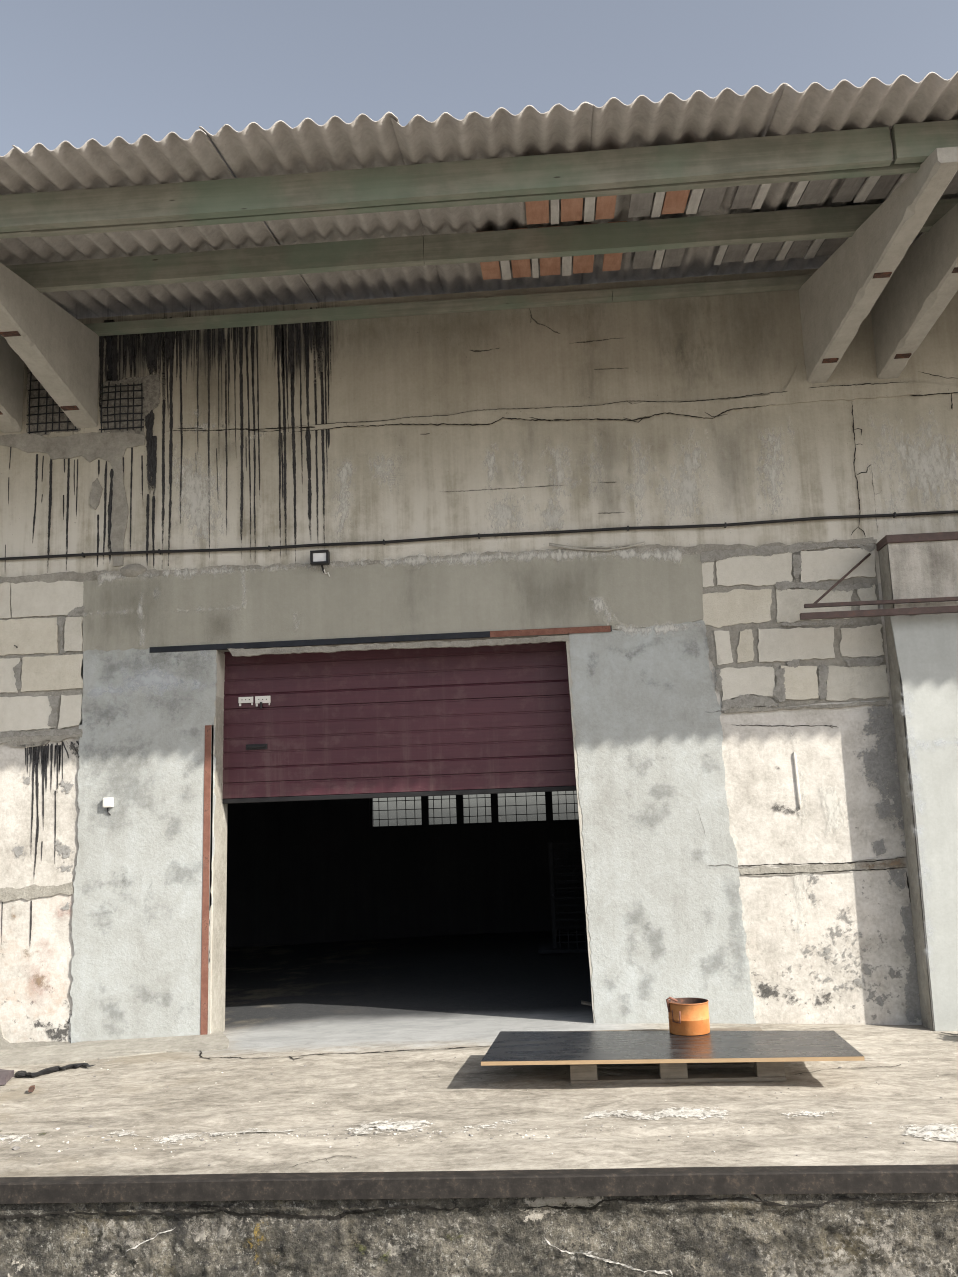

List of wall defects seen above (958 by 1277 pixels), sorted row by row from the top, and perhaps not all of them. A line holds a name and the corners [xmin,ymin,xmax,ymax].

crack [529,309,623,370]
water stain [32,454,78,573]
water stain [97,311,260,568]
crack [173,371,958,537]
water stain [25,741,79,876]